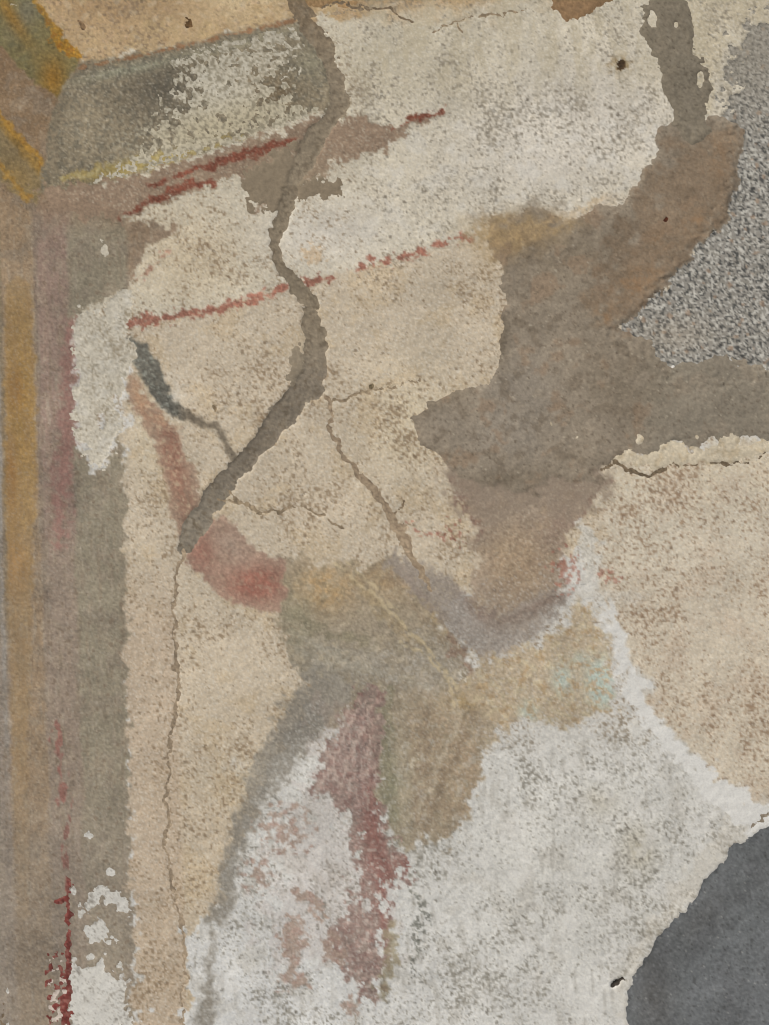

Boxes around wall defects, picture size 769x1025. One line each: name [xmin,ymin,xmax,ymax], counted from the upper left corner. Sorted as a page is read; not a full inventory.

spalling [622,5,769,370]
crack [162,0,526,1025]
crack [600,452,766,478]